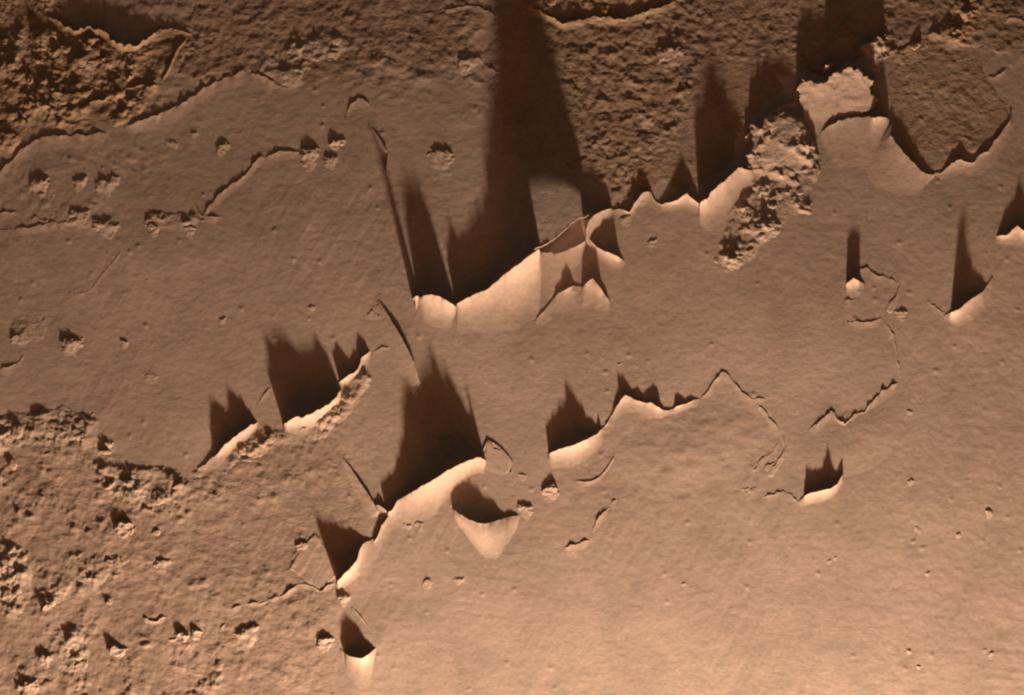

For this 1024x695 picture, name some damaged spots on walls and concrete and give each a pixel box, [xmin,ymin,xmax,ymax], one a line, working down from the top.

crack [344,97,373,123]
crack [196,150,300,226]
flaking render [0,0,1024,335]
peeling [374,300,420,387]
flaking render [0,351,535,695]
peeling [575,455,616,486]
peeling [548,395,700,469]
crack [699,371,799,506]
peeling [799,474,843,507]